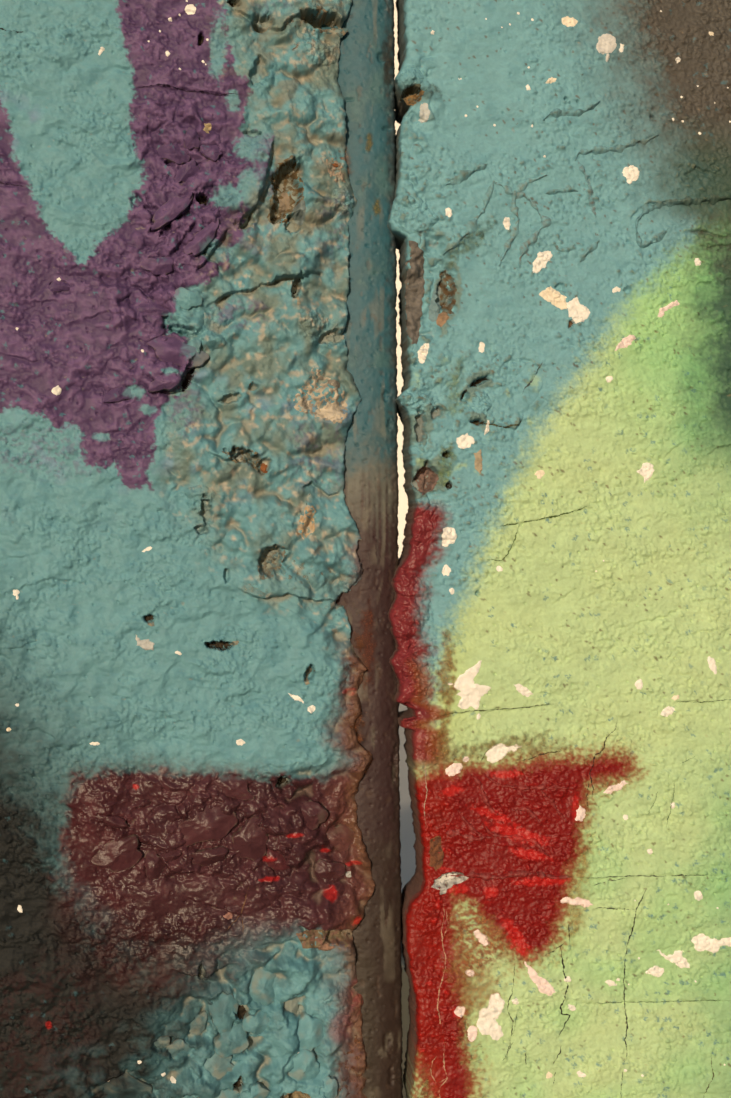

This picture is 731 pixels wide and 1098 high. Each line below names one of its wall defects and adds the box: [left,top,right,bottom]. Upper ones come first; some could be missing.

spalling [405,241,457,345]
crack [430,906,448,1098]
crack [502,967,526,1063]
crack [544,925,570,1084]
crack [573,874,728,1095]